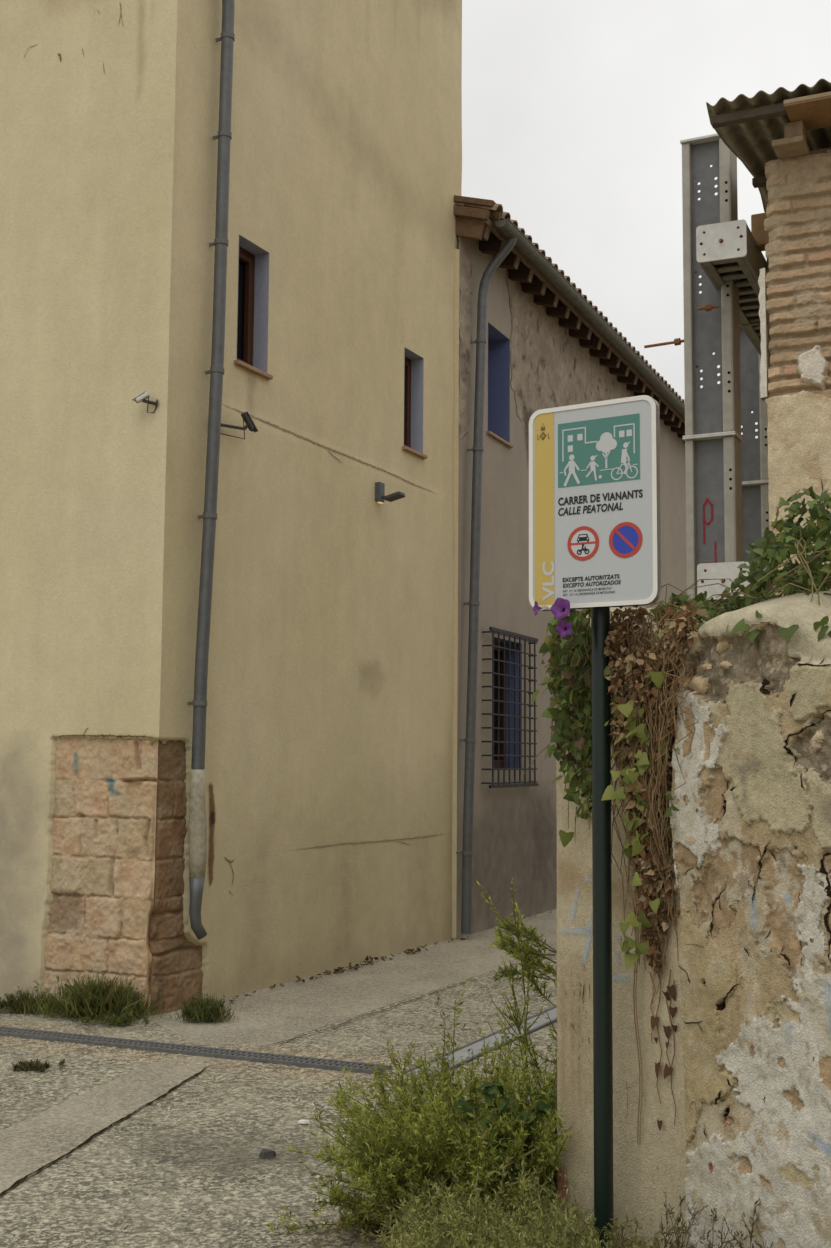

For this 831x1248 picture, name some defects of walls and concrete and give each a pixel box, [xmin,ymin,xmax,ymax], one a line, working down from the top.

crack [301,834,445,849]
peeling [669,624,831,1248]
crack [820,853,831,963]
crack [689,1078,731,1137]